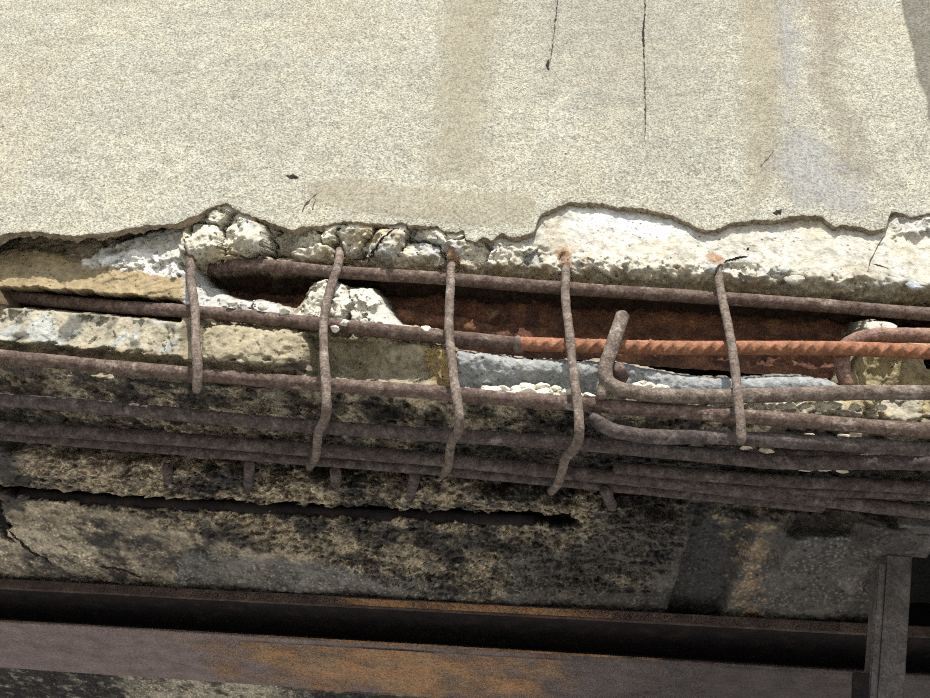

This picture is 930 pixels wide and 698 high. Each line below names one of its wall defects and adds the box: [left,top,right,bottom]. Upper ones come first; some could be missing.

crack [546,0,558,70]
crack [640,0,648,138]
damp [902,0,930,114]
rust [446,248,459,268]
rust [557,248,572,271]
rust [425,348,449,383]
spalling [0,202,930,601]
crack [0,484,53,566]
rust [346,598,594,618]
rust [225,635,619,698]